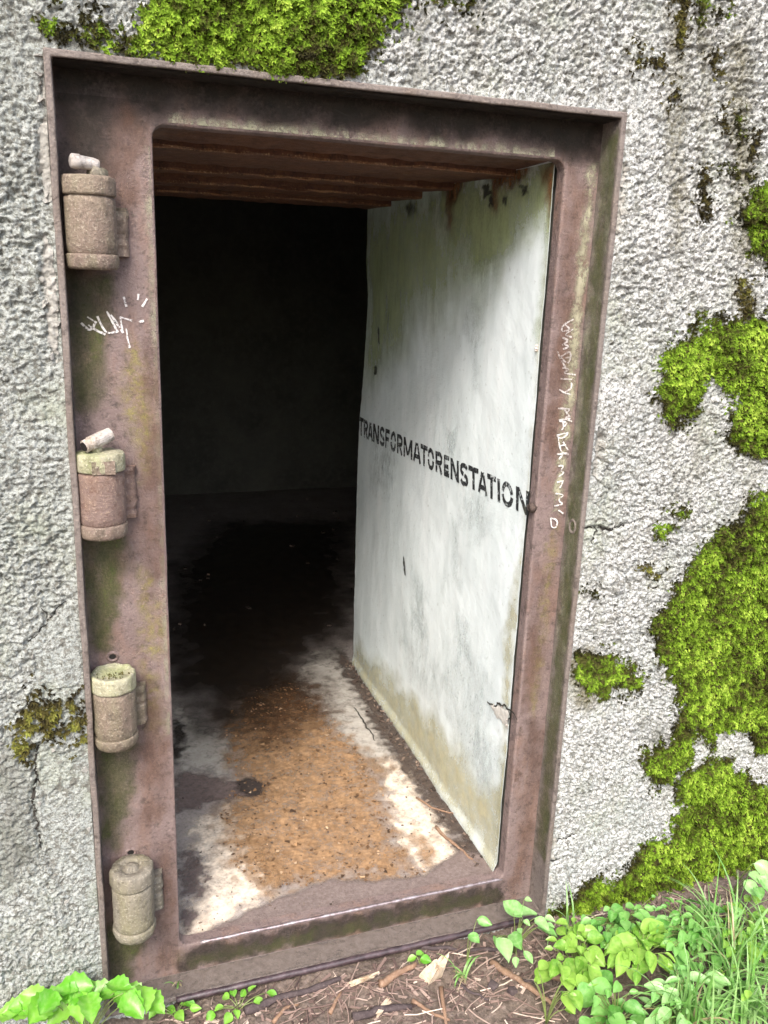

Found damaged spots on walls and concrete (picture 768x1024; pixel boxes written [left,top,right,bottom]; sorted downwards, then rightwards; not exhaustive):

crack [585,524,624,544]
water stain [169,521,506,935]
flaking render [490,703,509,729]
crack [31,742,41,848]